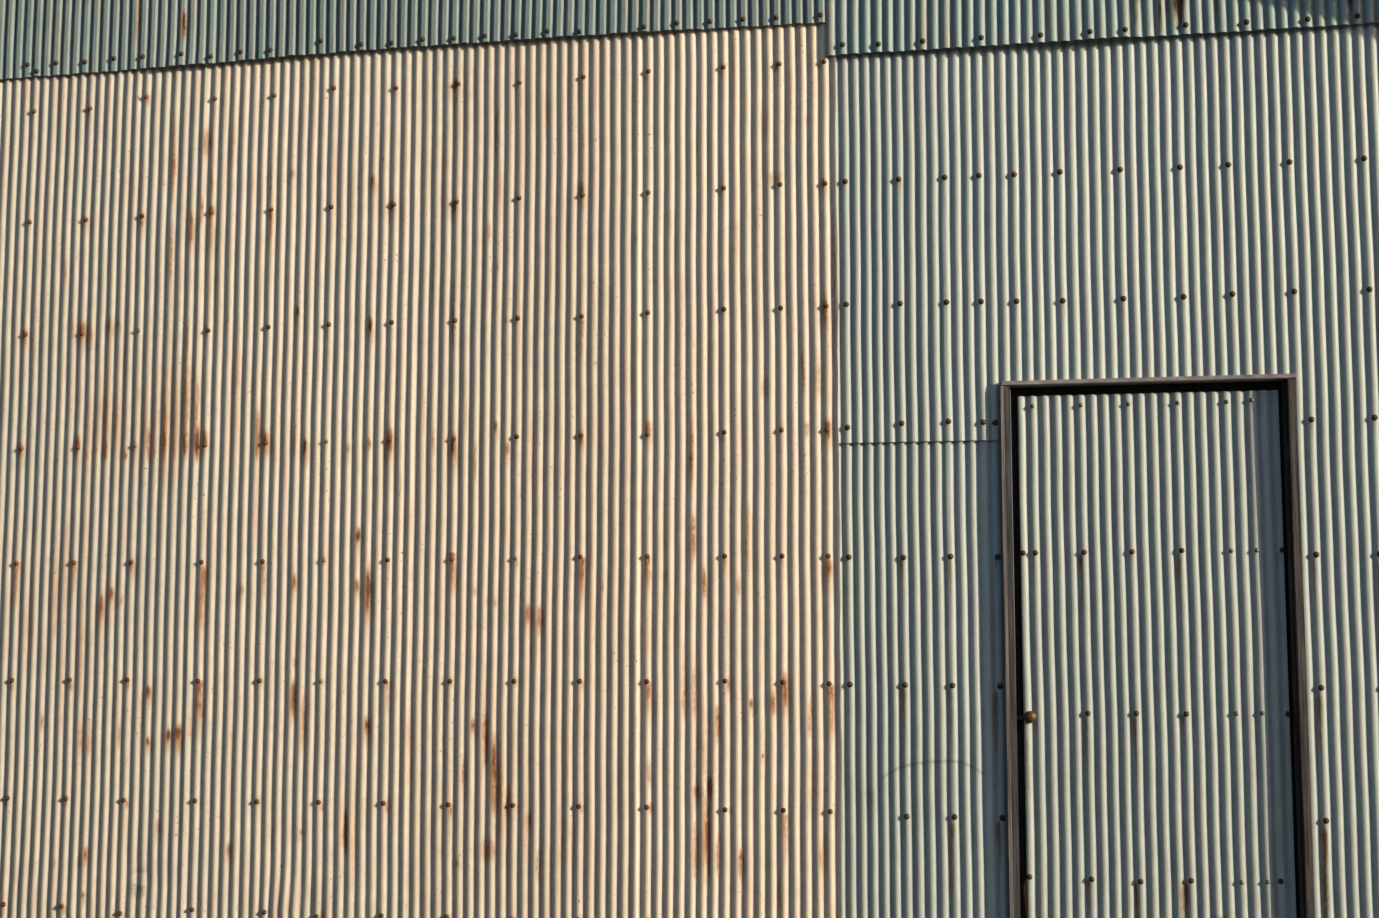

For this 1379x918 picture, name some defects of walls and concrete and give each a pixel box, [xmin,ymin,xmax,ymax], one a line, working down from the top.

rust [1158,0,1185,31]
rust [76,402,118,458]
rust [124,380,207,458]
rust [256,418,267,455]
rust [356,567,371,612]
rust [471,719,509,816]
rust [695,778,720,874]